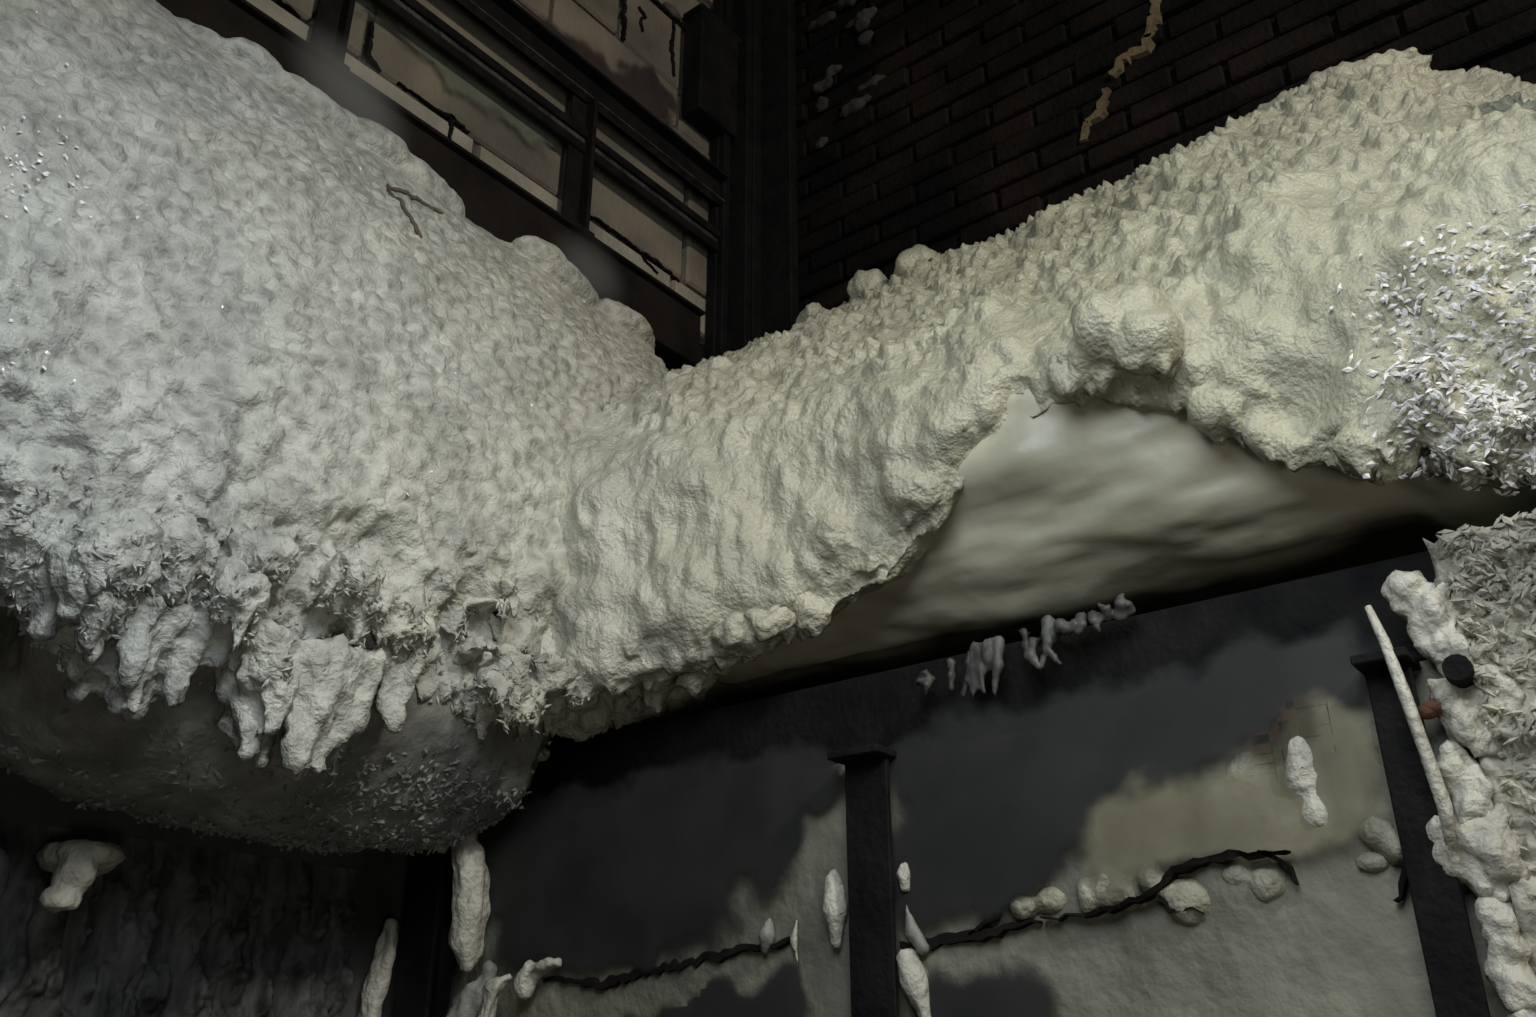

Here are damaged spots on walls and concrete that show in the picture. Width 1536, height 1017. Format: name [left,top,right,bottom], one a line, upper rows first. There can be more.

crack [620,0,685,77]
crack [1079,0,1163,143]
crack [899,849,1299,952]
crack [543,936,791,991]